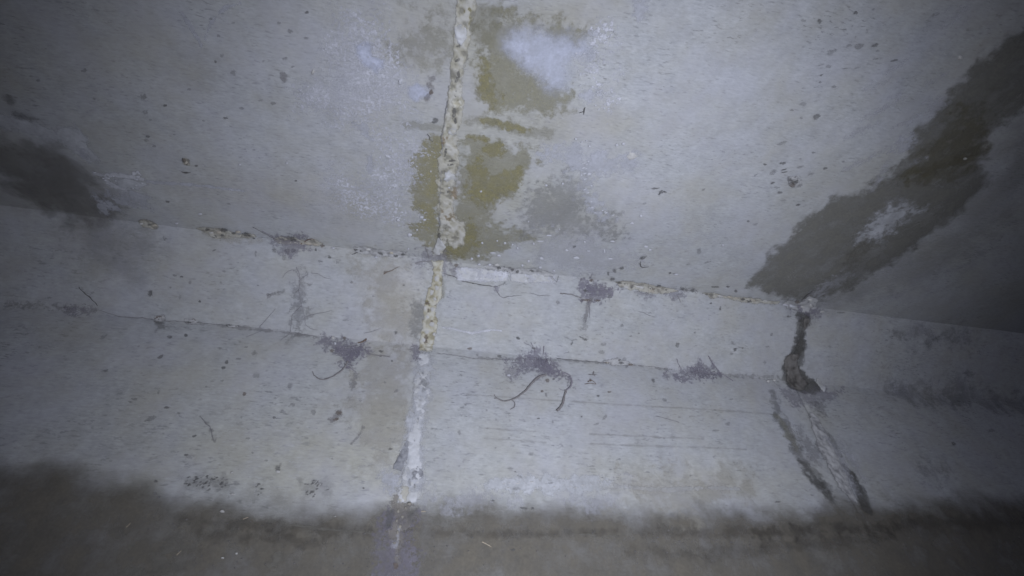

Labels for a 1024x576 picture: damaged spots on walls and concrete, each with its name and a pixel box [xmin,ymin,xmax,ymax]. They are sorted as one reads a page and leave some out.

leakage [0,114,243,215]
leakage [286,3,638,260]
leakage [749,33,1024,394]